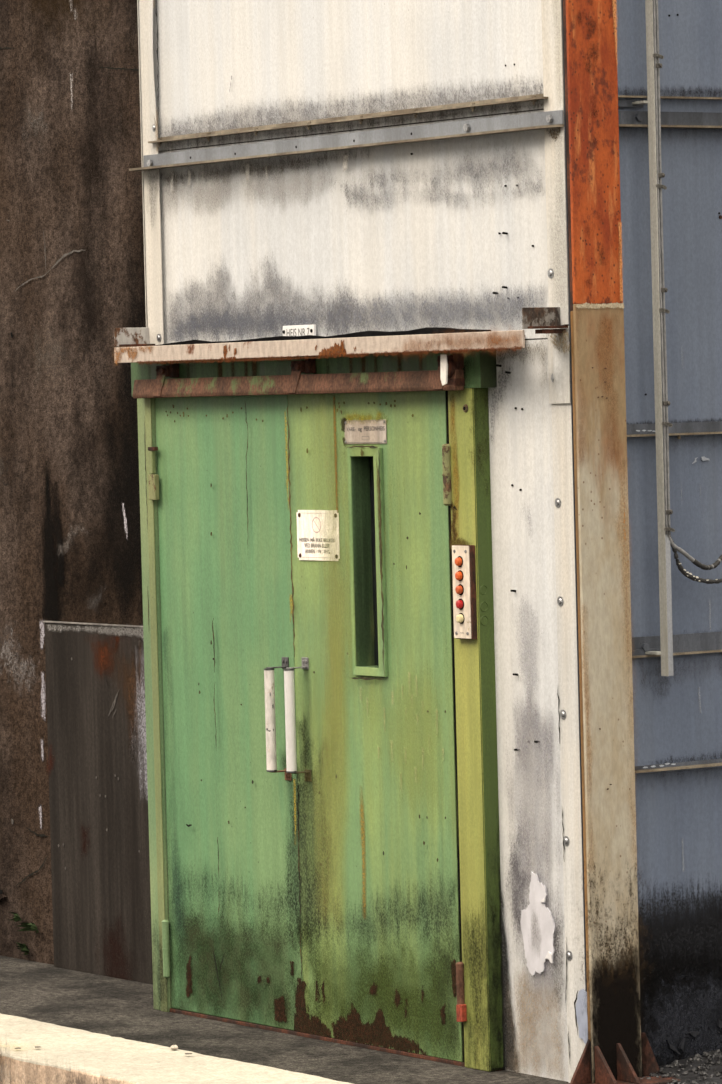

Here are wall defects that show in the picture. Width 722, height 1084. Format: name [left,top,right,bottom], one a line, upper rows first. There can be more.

leakage [160,81,543,135]
leakage [164,153,357,204]
leakage [416,150,538,202]
leakage [169,260,543,341]
rust [576,222,624,309]
rust [114,330,570,377]
leakage [507,698,563,1007]
peeling [520,871,556,975]
rust [274,961,428,1056]